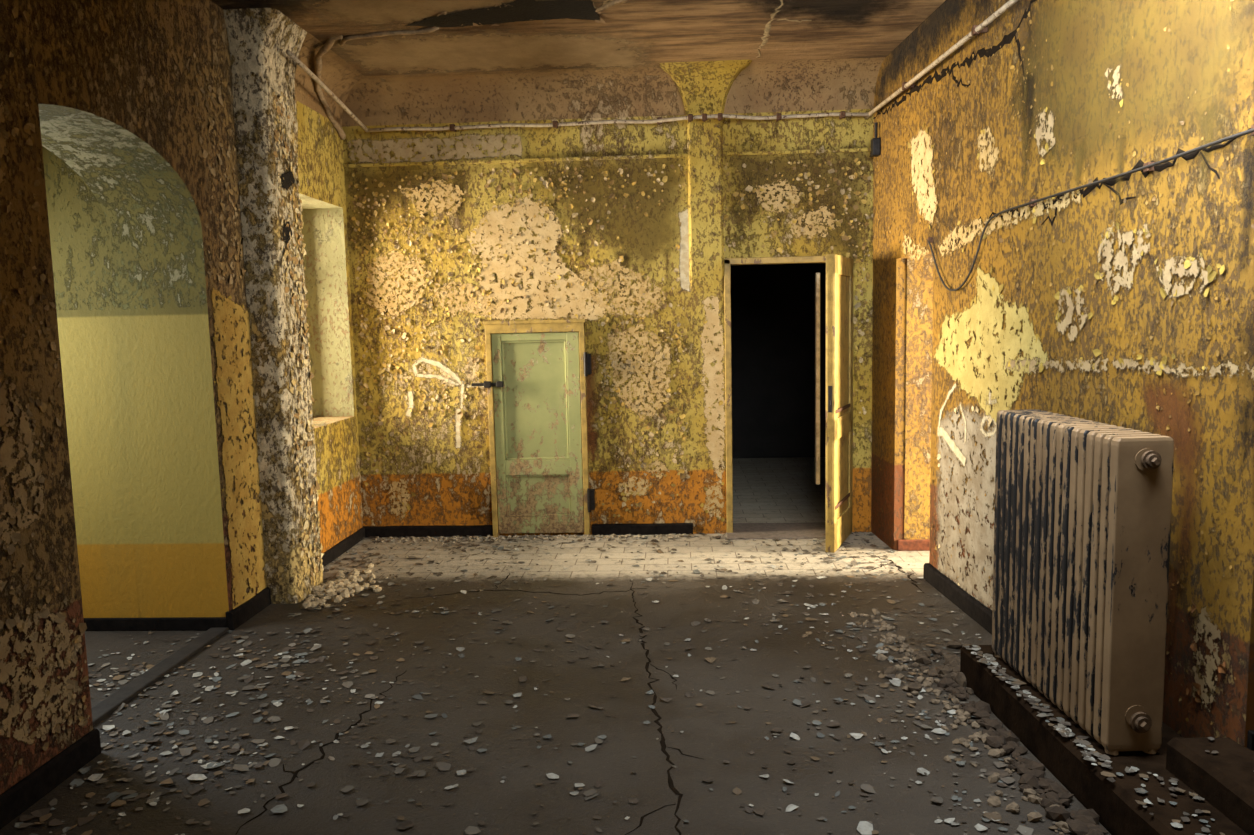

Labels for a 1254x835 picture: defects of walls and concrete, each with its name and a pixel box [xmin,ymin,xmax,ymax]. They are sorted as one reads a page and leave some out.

crack [756,0,811,58]
peeling [348,133,726,522]
flaking render [723,8,1254,610]
crack [404,573,702,835]